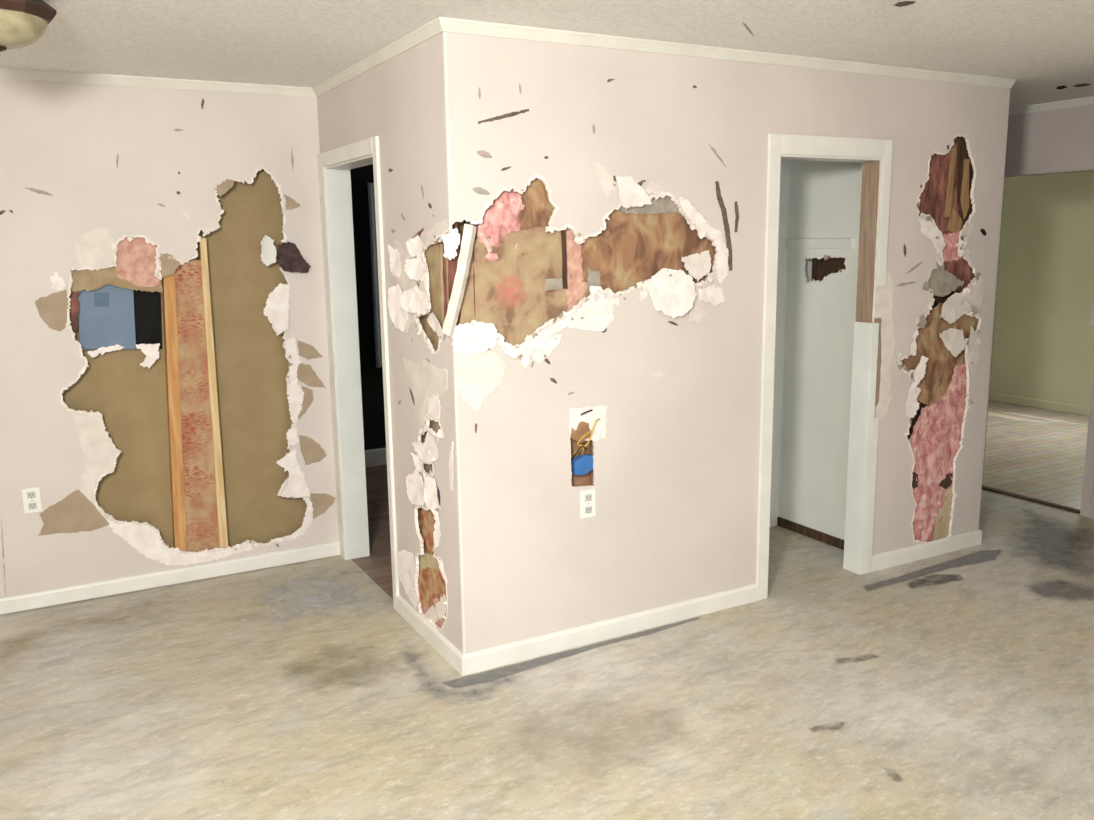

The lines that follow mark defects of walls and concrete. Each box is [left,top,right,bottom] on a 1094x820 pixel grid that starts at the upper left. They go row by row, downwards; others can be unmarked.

spalling [50,167,313,566]
spalling [388,160,729,633]
crack [715,181,739,271]
spalling [802,254,847,283]
spalling [874,134,984,543]